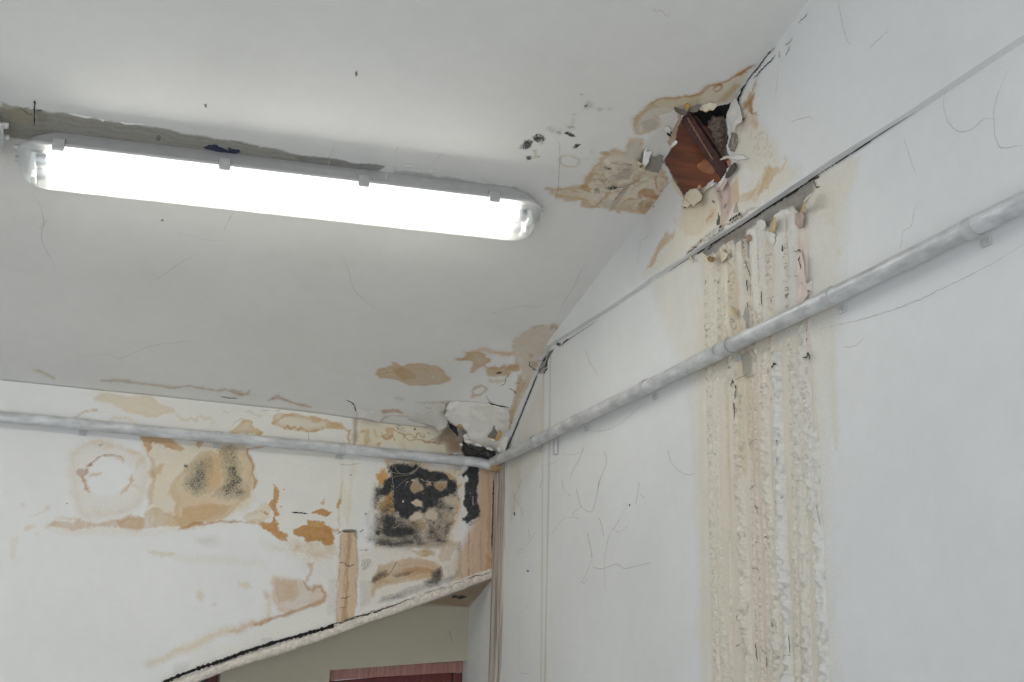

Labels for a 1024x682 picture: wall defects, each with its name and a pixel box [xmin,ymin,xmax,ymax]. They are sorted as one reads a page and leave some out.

flaking render [636,95,813,263]
damp [8,321,561,682]
crack [161,481,494,682]
flaking render [333,528,362,624]